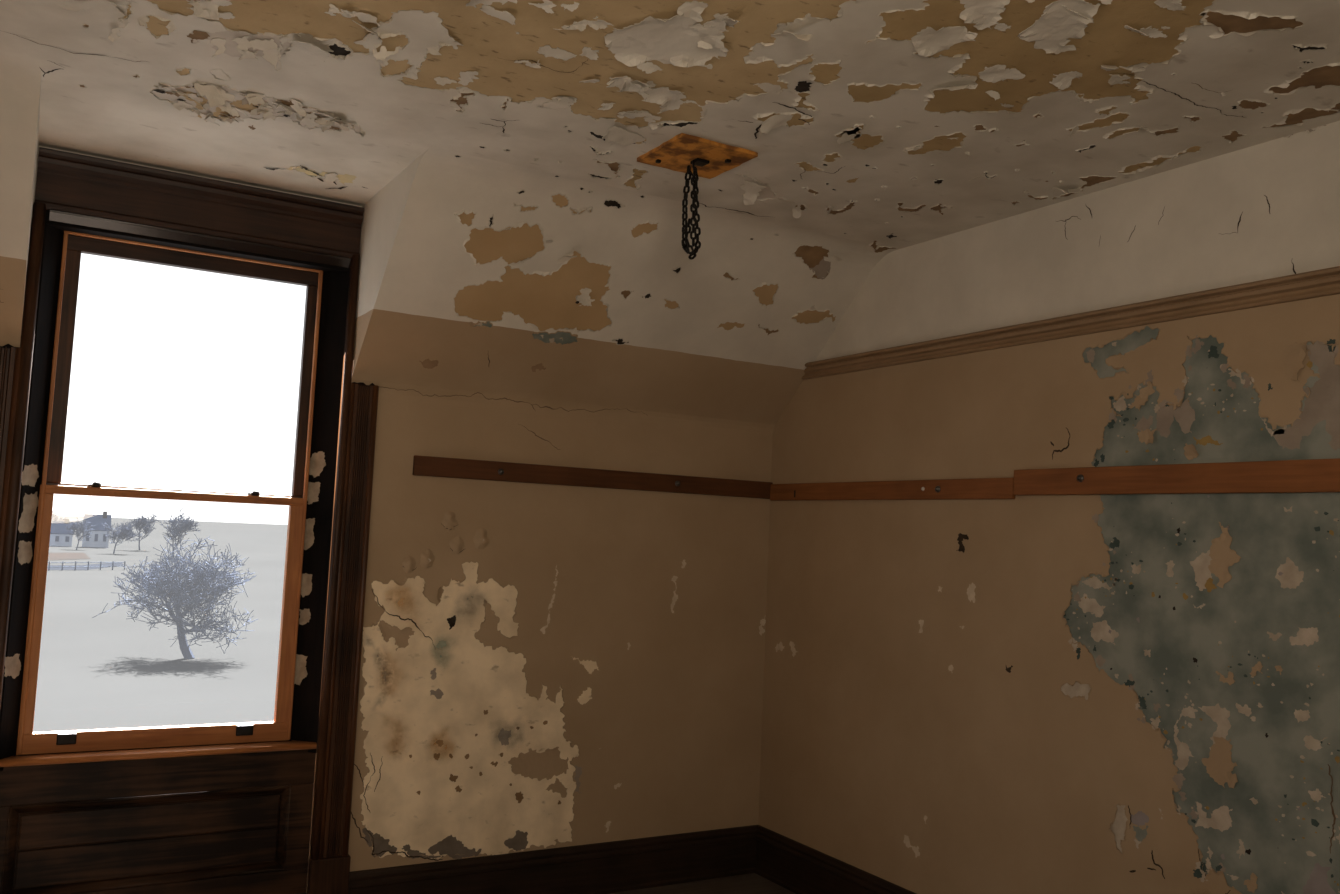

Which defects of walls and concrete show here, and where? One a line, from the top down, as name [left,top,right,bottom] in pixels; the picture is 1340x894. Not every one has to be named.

peeling [53,0,1340,346]
peeling [1082,325,1340,467]
peeling [18,464,39,565]
peeling [304,451,326,550]
peeling [299,573,312,625]
peeling [4,654,21,679]
peeling [294,654,308,685]
flaking render [351,561,599,861]
peeling [1060,492,1340,894]